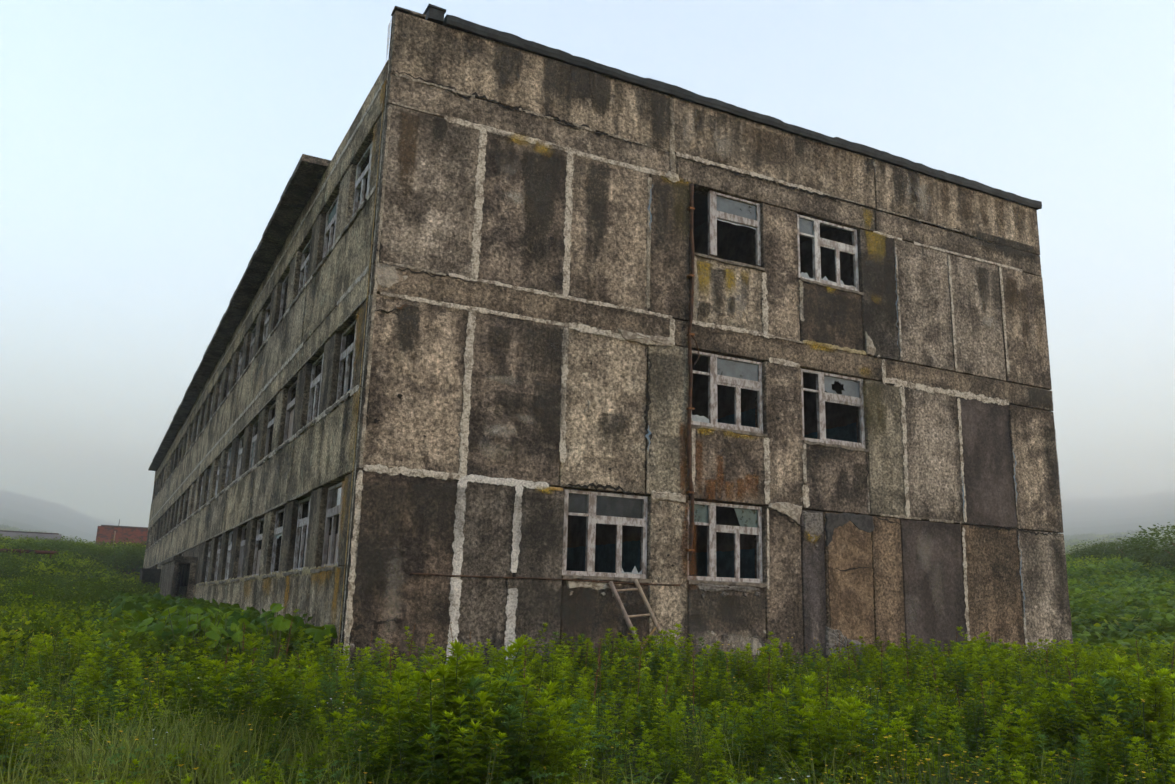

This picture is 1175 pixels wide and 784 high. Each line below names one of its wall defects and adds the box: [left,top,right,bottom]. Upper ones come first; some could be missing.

leakage [396,111,447,193]
leakage [495,43,523,91]
leakage [508,145,563,267]
leakage [545,58,611,112]
leakage [636,89,672,149]
leakage [694,109,726,137]
leakage [866,158,926,208]
leakage [942,185,1039,262]
rust [680,426,758,572]
leakage [356,483,468,595]
peeling [769,498,874,661]